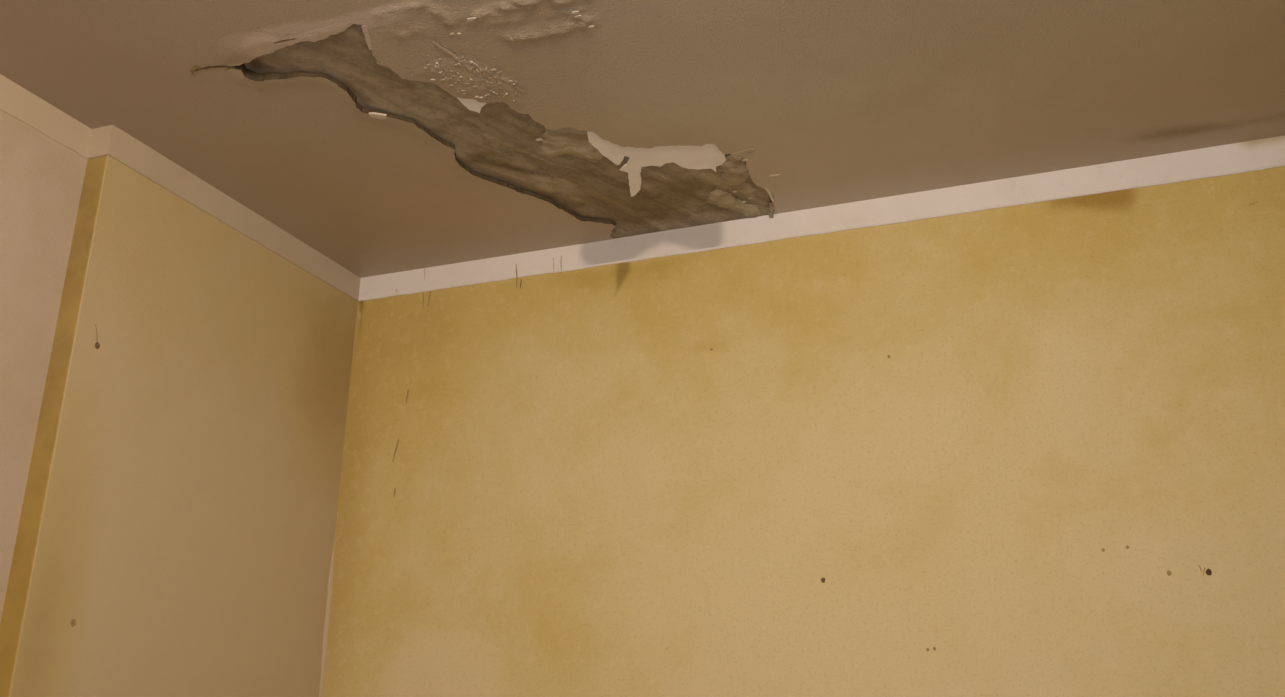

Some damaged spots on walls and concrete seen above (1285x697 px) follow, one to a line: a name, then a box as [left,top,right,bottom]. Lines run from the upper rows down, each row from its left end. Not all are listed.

flaking render [230,0,780,239]